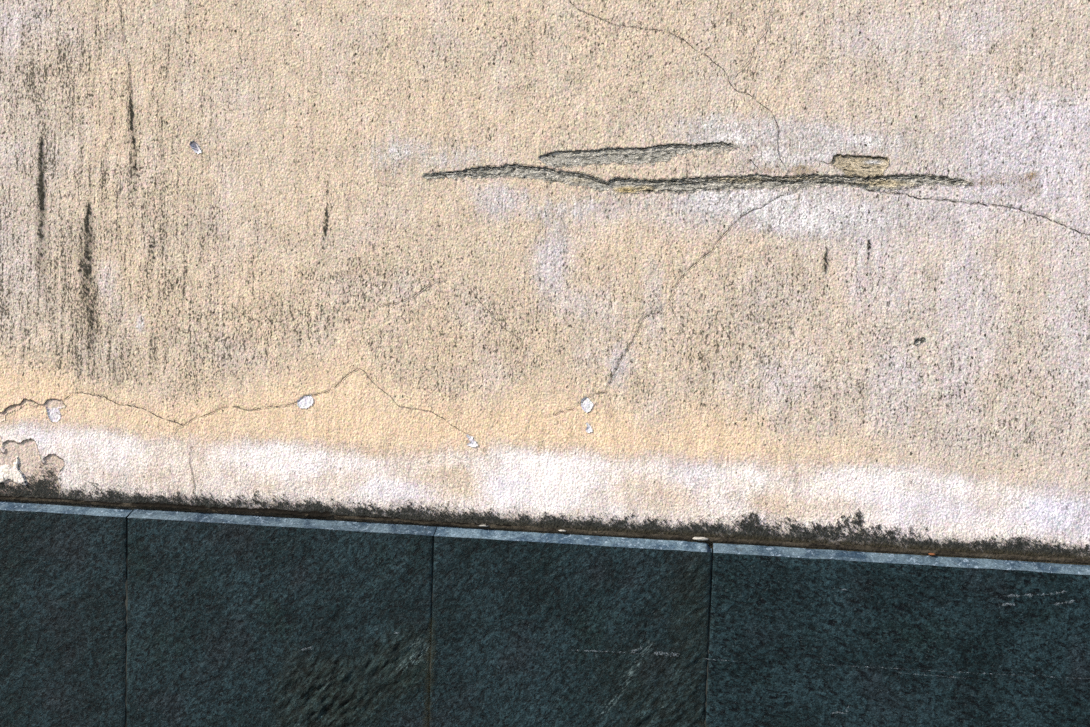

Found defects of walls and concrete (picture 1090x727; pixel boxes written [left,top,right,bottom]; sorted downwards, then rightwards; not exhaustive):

water stain [36,136,45,282]
water stain [128,83,138,189]
crack [542,1,797,419]
spalling [422,141,973,194]
crack [865,186,1090,235]
water stain [78,200,98,359]
peeling [0,437,64,495]
peeling [0,398,66,422]
crack [65,368,469,494]
water stain [0,421,1090,572]